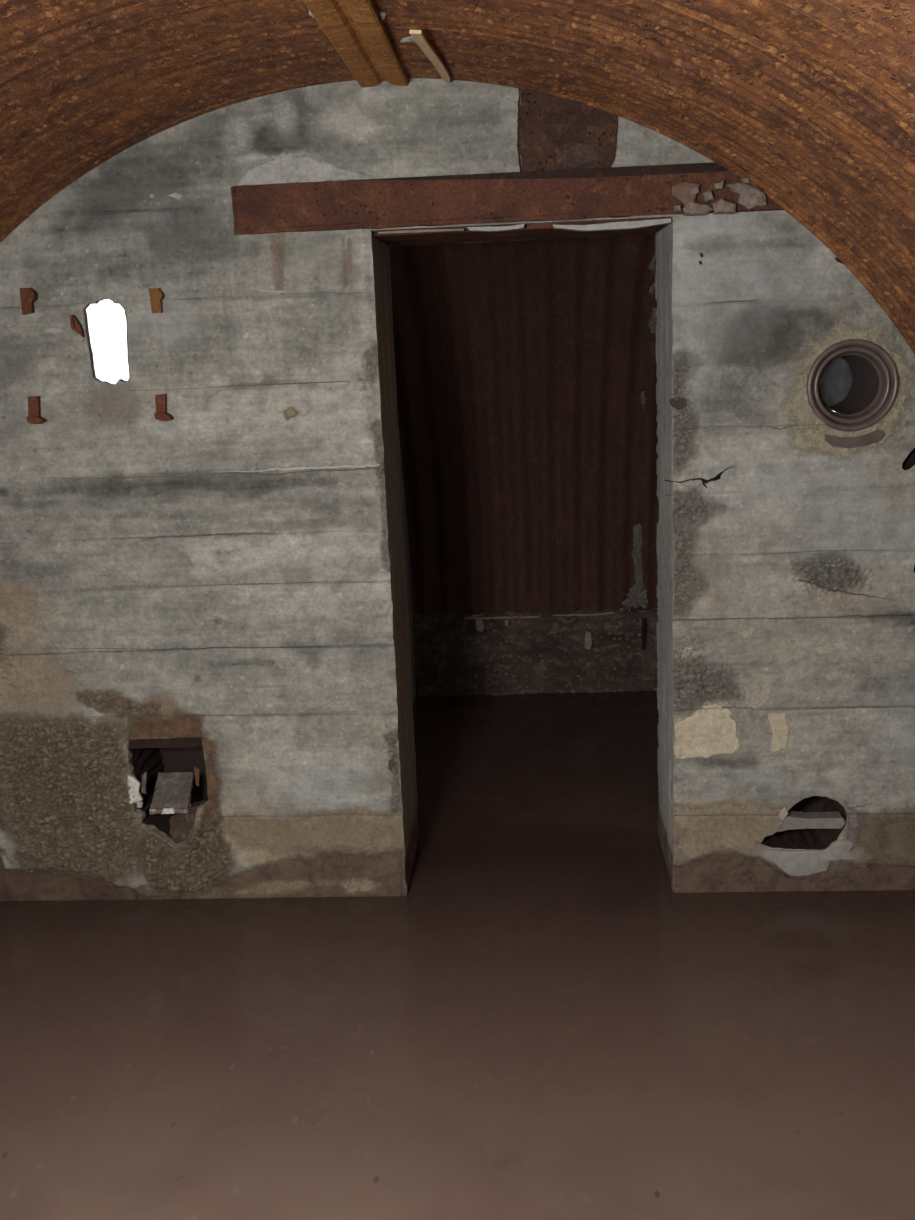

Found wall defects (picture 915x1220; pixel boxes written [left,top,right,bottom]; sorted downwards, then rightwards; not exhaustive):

crack [664,466,735,496]
spalling [902,448,915,471]
peeling [673,639,833,759]
spalling [0,692,233,897]